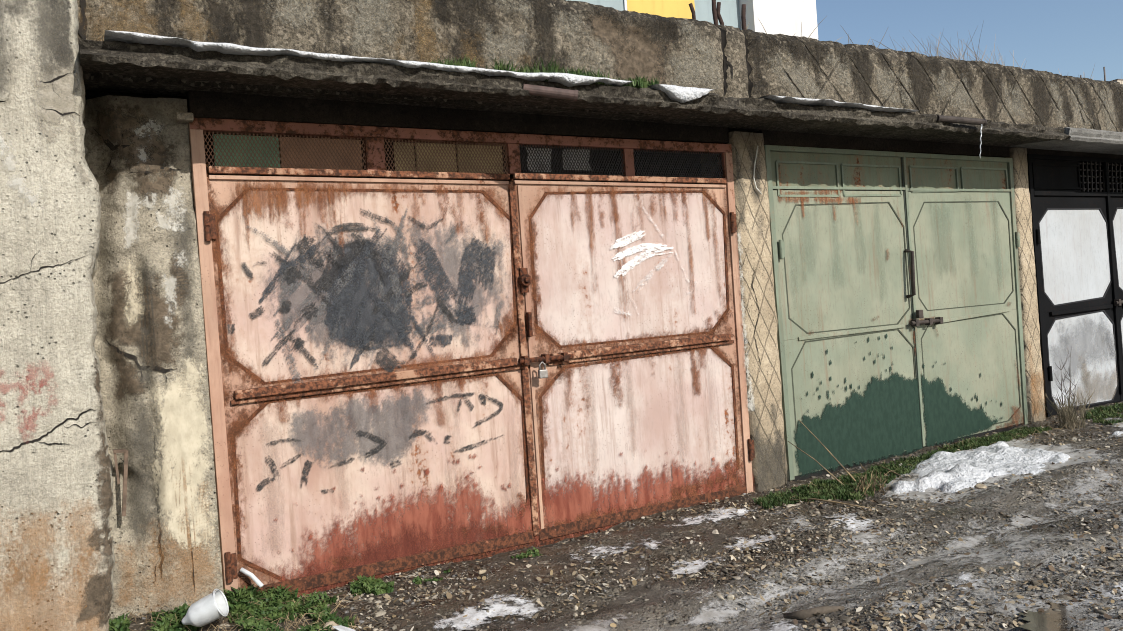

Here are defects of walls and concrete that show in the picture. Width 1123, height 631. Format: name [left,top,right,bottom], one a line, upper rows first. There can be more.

crack [718,27,761,97]
leakage [745,32,1123,131]
rust [778,169,861,218]
crack [0,250,85,294]
crack [106,340,184,390]
leakage [138,267,155,384]
leakage [176,211,194,361]
rust [207,178,367,485]
rust [390,180,745,519]
crack [0,409,99,452]
leakage [128,404,158,536]
rust [232,507,286,589]